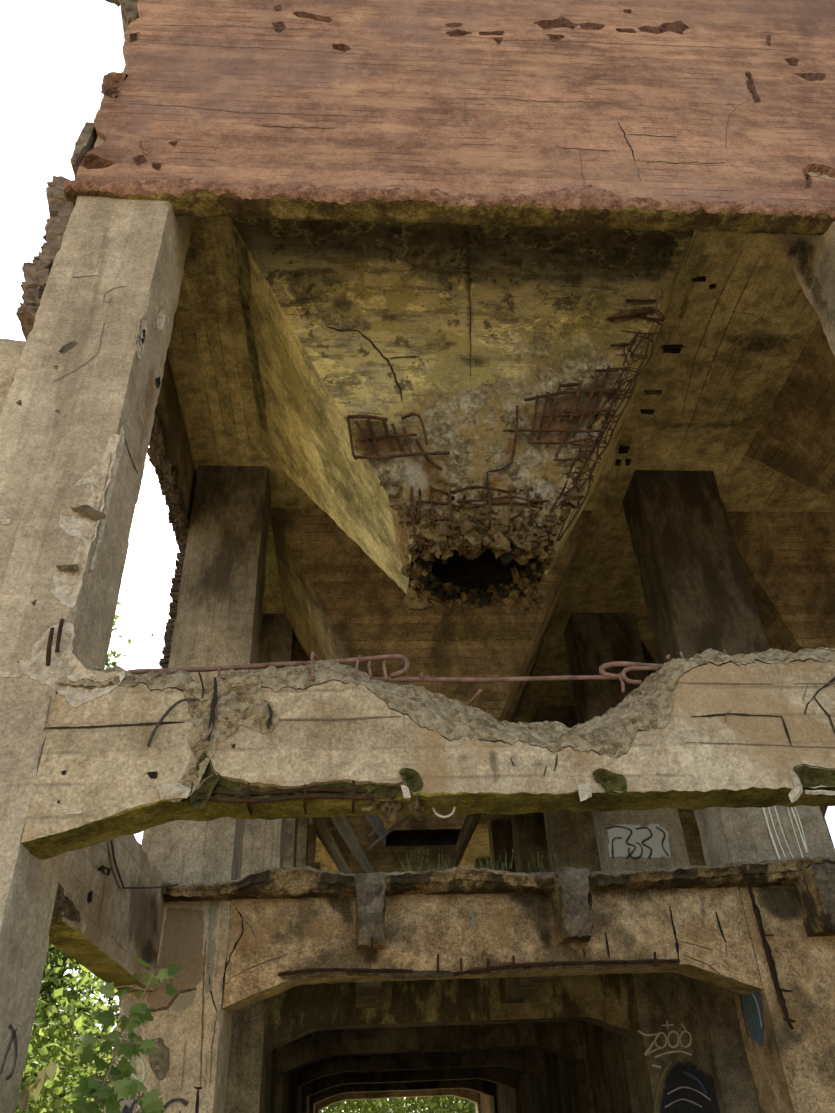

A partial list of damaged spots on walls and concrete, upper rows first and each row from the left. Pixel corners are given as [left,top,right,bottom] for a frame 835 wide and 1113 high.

spalling [446,23,505,44]
spalling [534,16,690,42]
spalling [101,72,126,98]
crack [465,97,748,182]
damp [385,228,673,291]
damp [235,233,350,479]
crack [326,326,419,401]
spalling [346,255,717,615]
spalling [0,424,835,815]
crack [677,677,835,748]
crack [748,884,796,1030]
crack [194,907,287,1113]